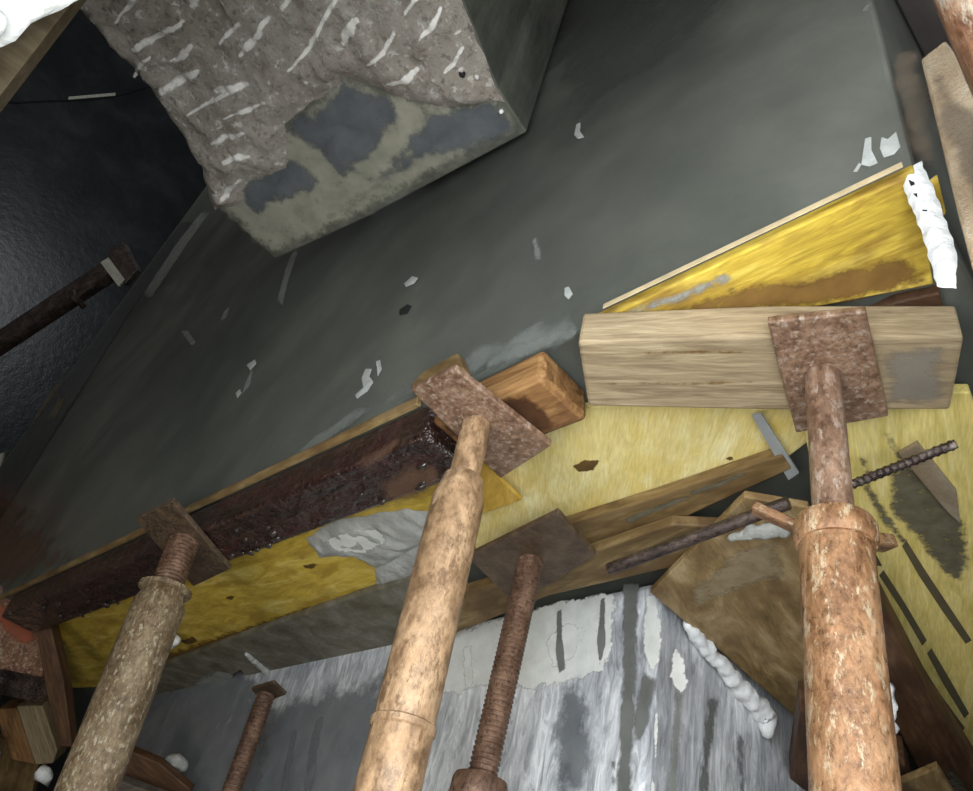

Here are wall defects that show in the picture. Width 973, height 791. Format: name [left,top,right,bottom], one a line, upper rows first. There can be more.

spalling [80,0,504,209]
damp [135,671,256,791]
damp [241,683,381,791]
damp [556,691,587,791]
damp [612,584,658,791]
damp [668,692,681,791]
damp [700,699,718,791]